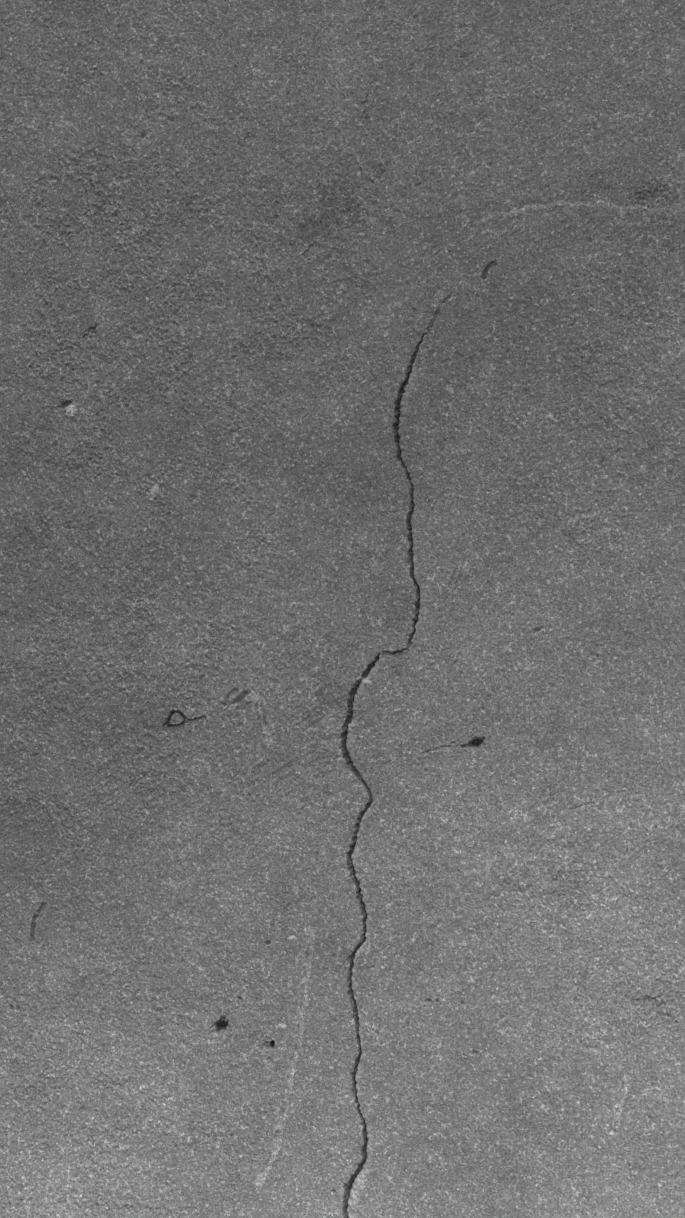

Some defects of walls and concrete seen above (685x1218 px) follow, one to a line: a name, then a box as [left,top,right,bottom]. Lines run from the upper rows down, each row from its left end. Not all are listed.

crack [481,259,498,279]
crack [339,291,453,1218]